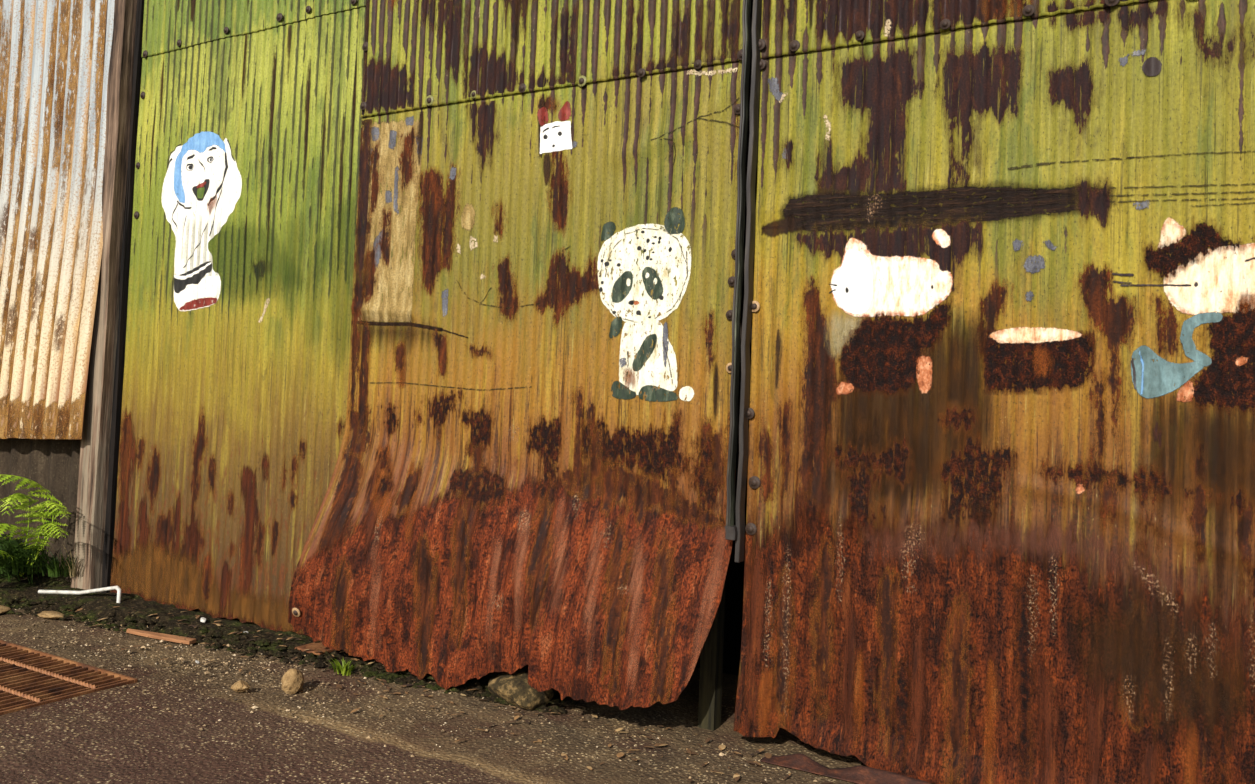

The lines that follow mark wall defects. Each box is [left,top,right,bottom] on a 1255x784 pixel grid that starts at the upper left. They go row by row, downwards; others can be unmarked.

rust [0,0,108,439]
rust [111,0,740,710]
rust [763,0,1167,196]
rust [733,264,1255,784]
rust [1182,9,1255,64]